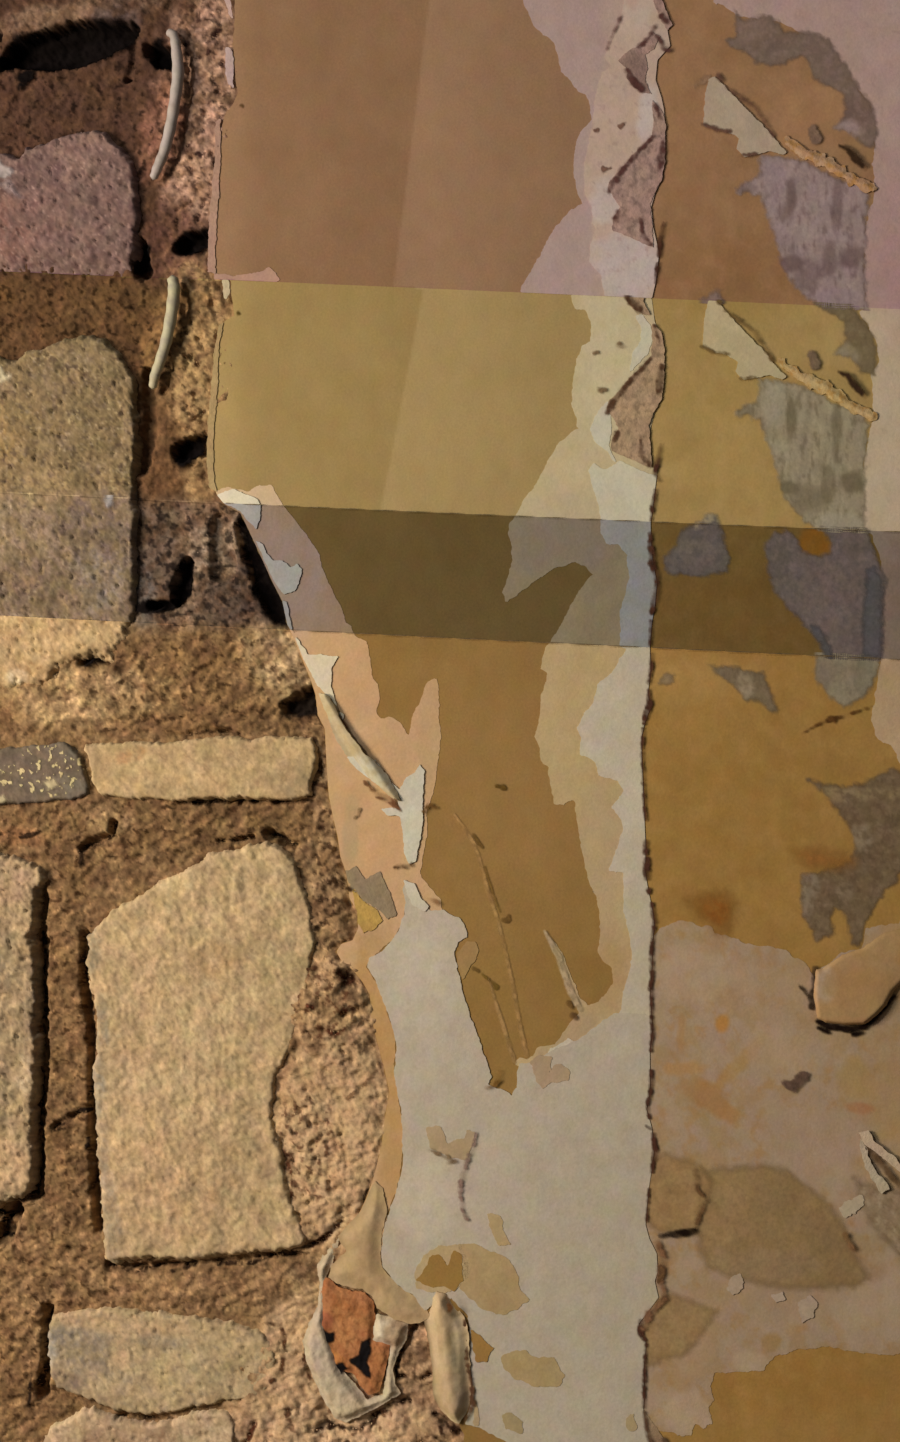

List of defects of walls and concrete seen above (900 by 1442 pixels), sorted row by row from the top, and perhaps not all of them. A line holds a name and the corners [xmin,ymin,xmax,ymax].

crack [654,222,664,276]
peeling [214,0,900,1442]
crack [640,457,705,1283]
crack [799,966,896,1037]
crack [637,1323,647,1408]